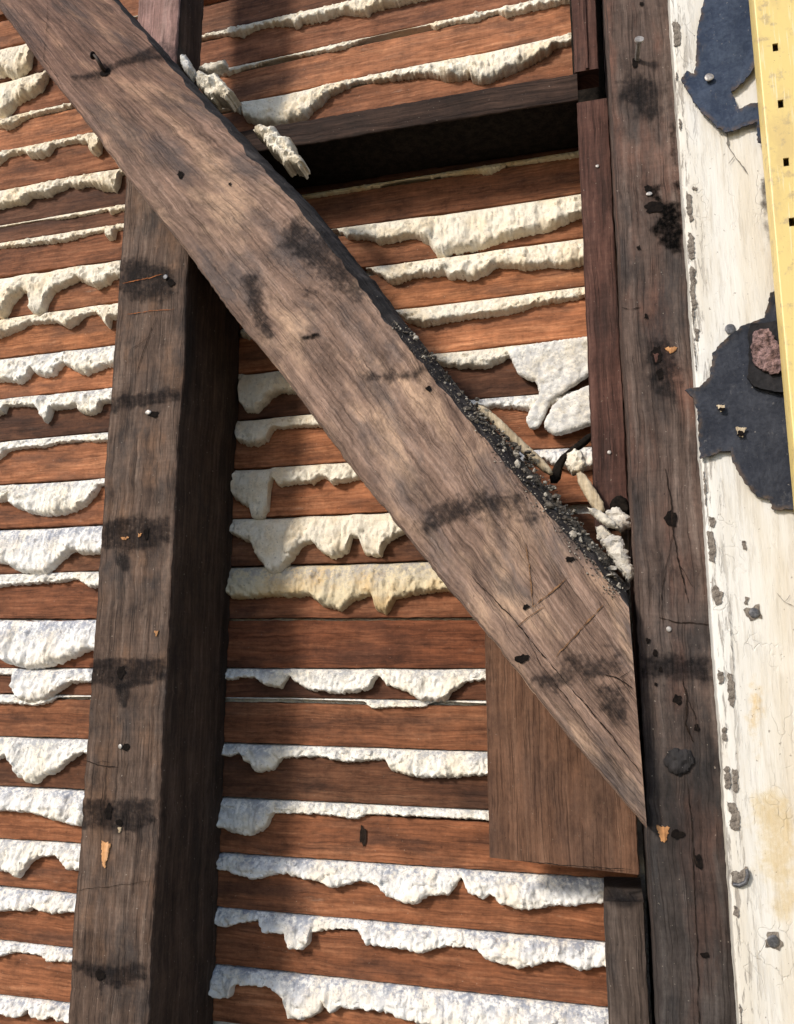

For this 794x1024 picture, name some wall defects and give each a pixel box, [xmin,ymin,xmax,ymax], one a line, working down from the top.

peeling [703,472,716,563]
peeling [711,585,723,605]
crack [471,575,641,774]
peeling [717,670,736,707]
peeling [723,766,740,831]
peeling [731,866,750,886]